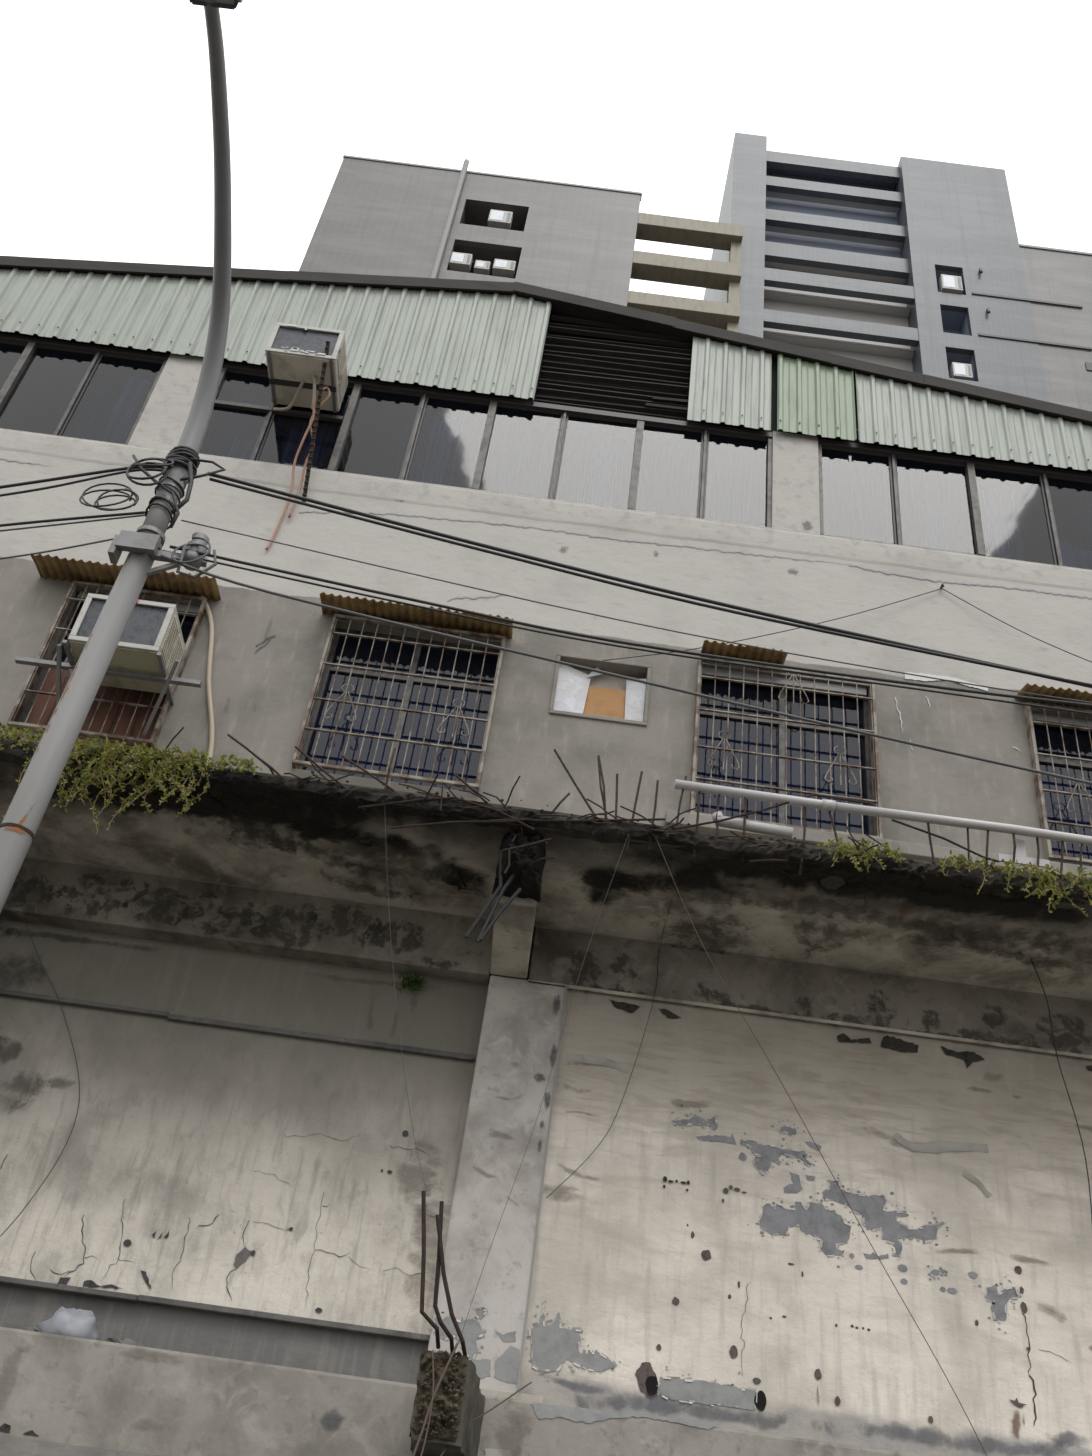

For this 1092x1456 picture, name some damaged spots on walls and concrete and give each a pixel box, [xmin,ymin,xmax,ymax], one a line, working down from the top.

damp [8,766,485,970]
damp [583,852,1092,971]
spalling [837,1033,919,1052]
spalling [941,1046,985,1068]
damp [916,1007,1092,1059]
crack [30,1200,137,1281]
crack [172,1170,428,1300]
peeling [671,1104,949,1284]
peeling [420,1191,761,1430]
peeling [968,1266,1028,1334]
crack [1022,1313,1067,1425]
damp [972,1432,1079,1456]